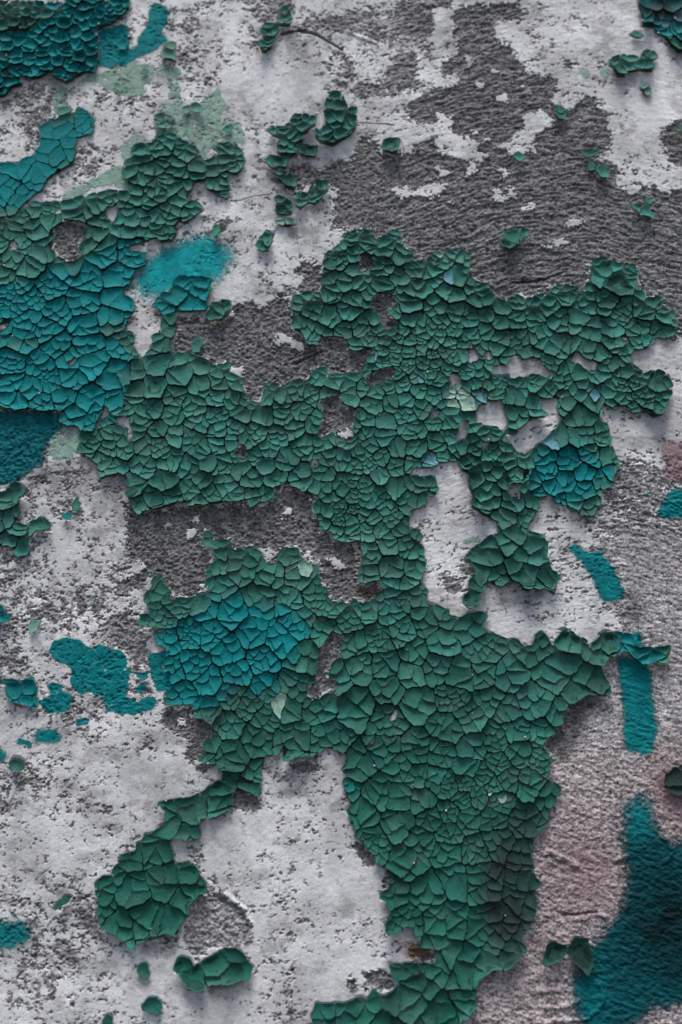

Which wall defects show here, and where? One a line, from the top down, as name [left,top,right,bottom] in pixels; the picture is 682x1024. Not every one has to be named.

peeling [258,5,292,50]
peeling [267,113,318,156]
spalling [276,0,682,340]
crack [511,270,565,284]
crack [289,349,324,365]
peeling [0,131,678,608]
peeling [554,627,671,666]
peeling [0,677,38,709]
peeling [94,483,612,1024]
peeling [664,764,682,796]
peeling [54,895,72,911]
crack [562,909,599,917]